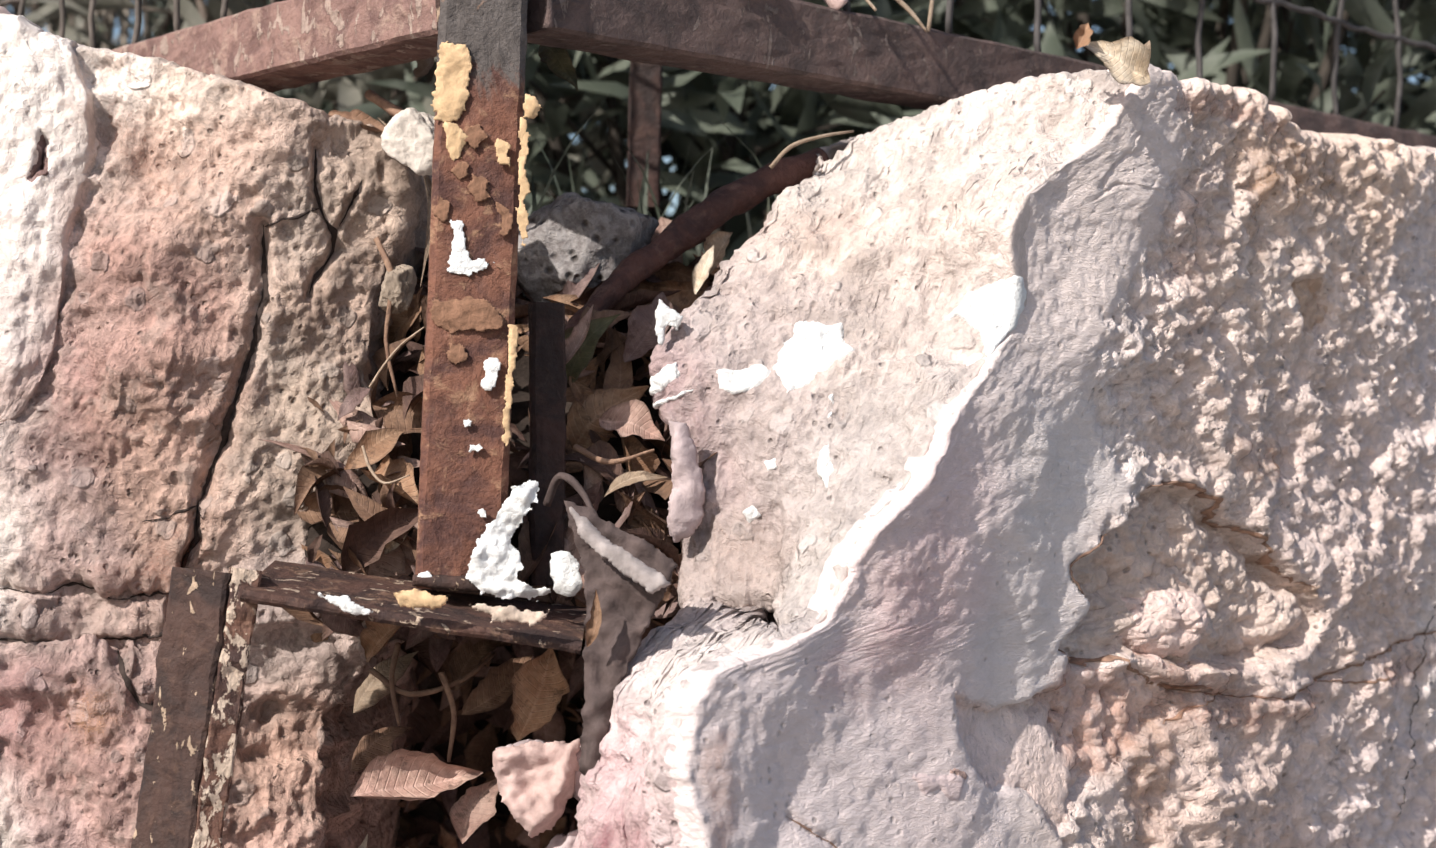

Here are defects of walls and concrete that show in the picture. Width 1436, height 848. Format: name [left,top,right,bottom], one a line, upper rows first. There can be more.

flaking render [1102,85,1183,196]
crack [0,149,362,600]
spalling [572,69,1130,848]
crack [0,636,27,644]
crack [103,632,162,711]
flaking render [912,485,1322,831]
crack [1163,606,1436,817]